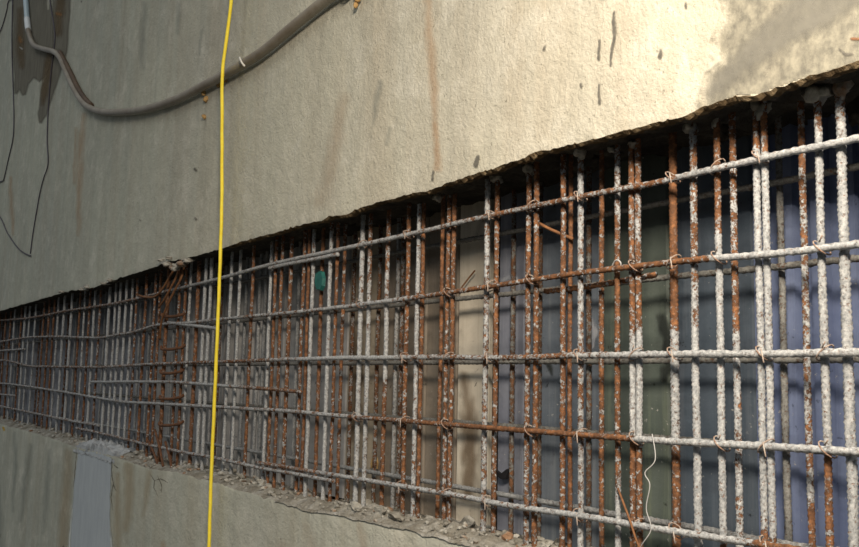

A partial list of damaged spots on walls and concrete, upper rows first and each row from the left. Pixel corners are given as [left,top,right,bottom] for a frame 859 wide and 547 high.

leakage [12,0,70,123]
leakage [709,0,859,103]
spalling [0,256,218,470]